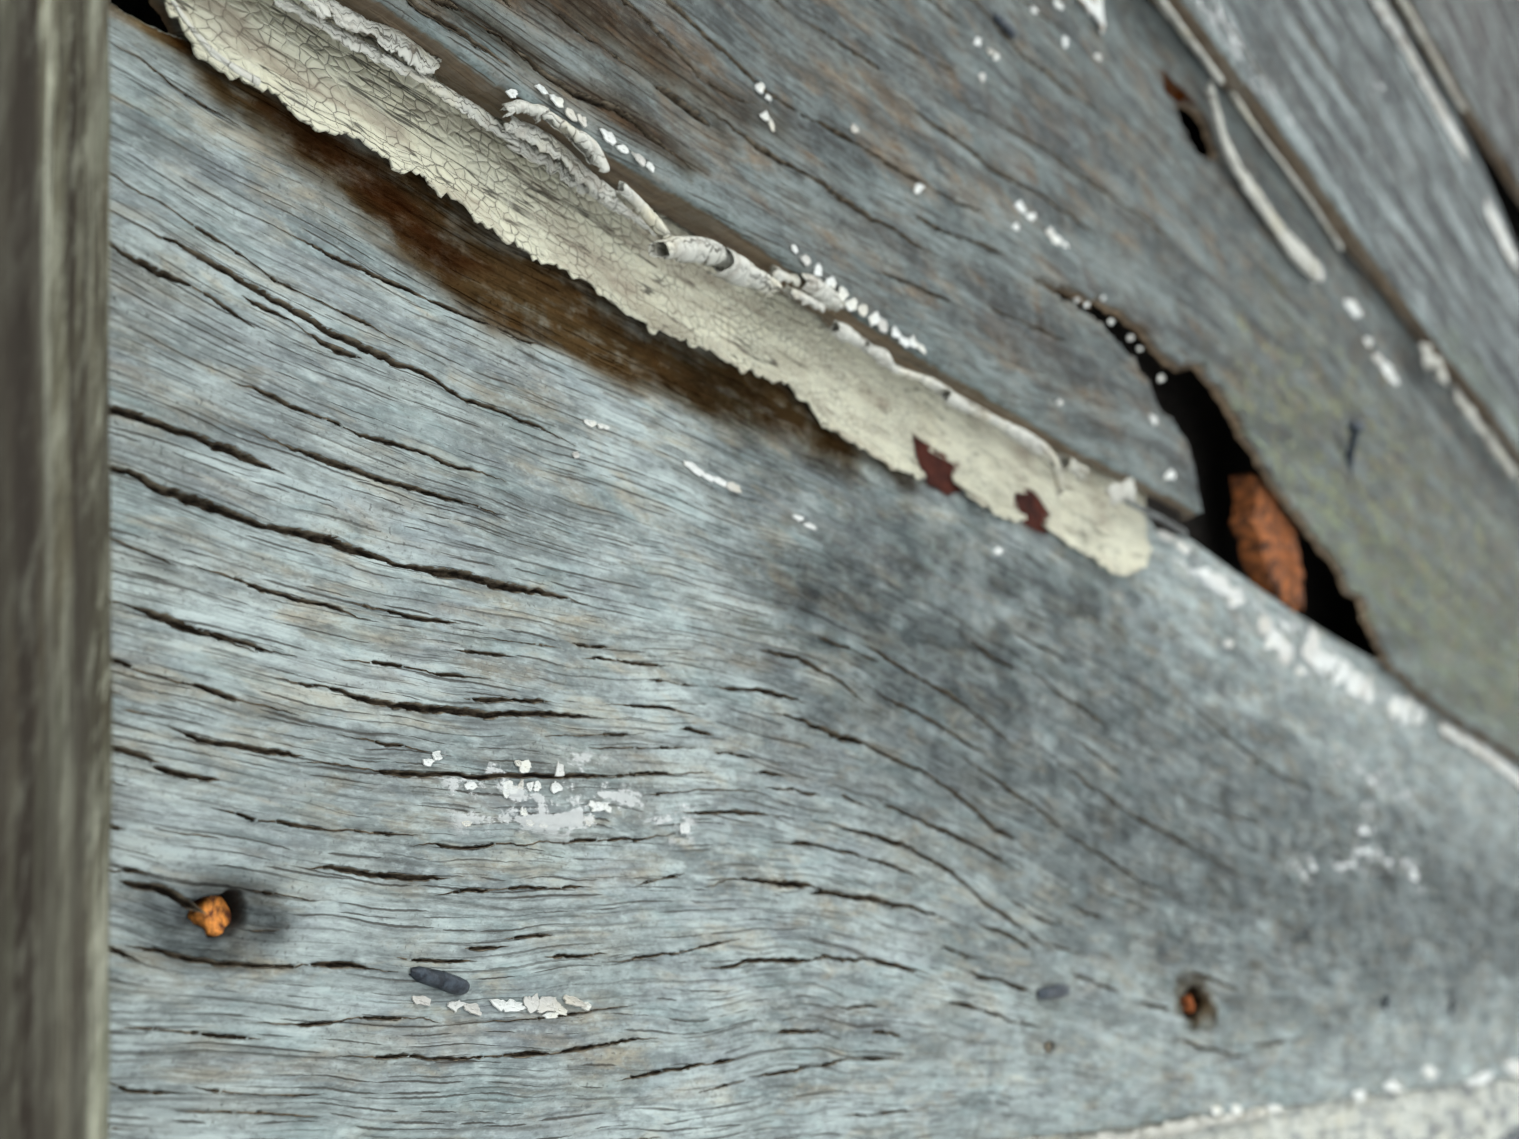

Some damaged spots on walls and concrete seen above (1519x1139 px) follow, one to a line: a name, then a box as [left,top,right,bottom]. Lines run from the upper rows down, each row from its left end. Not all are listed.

peeling [1371,0,1469,166]
crack [110,172,577,447]
peeling [163,0,1246,606]
crack [109,380,506,516]
crack [110,465,589,605]
peeling [1258,615,1519,788]
peeling [500,760,565,829]
crack [110,537,1286,1060]
peeling [411,993,592,1019]
crack [119,1004,904,1093]
rust [1179,984,1217,1026]
peeling [1023,1058,1519,1139]